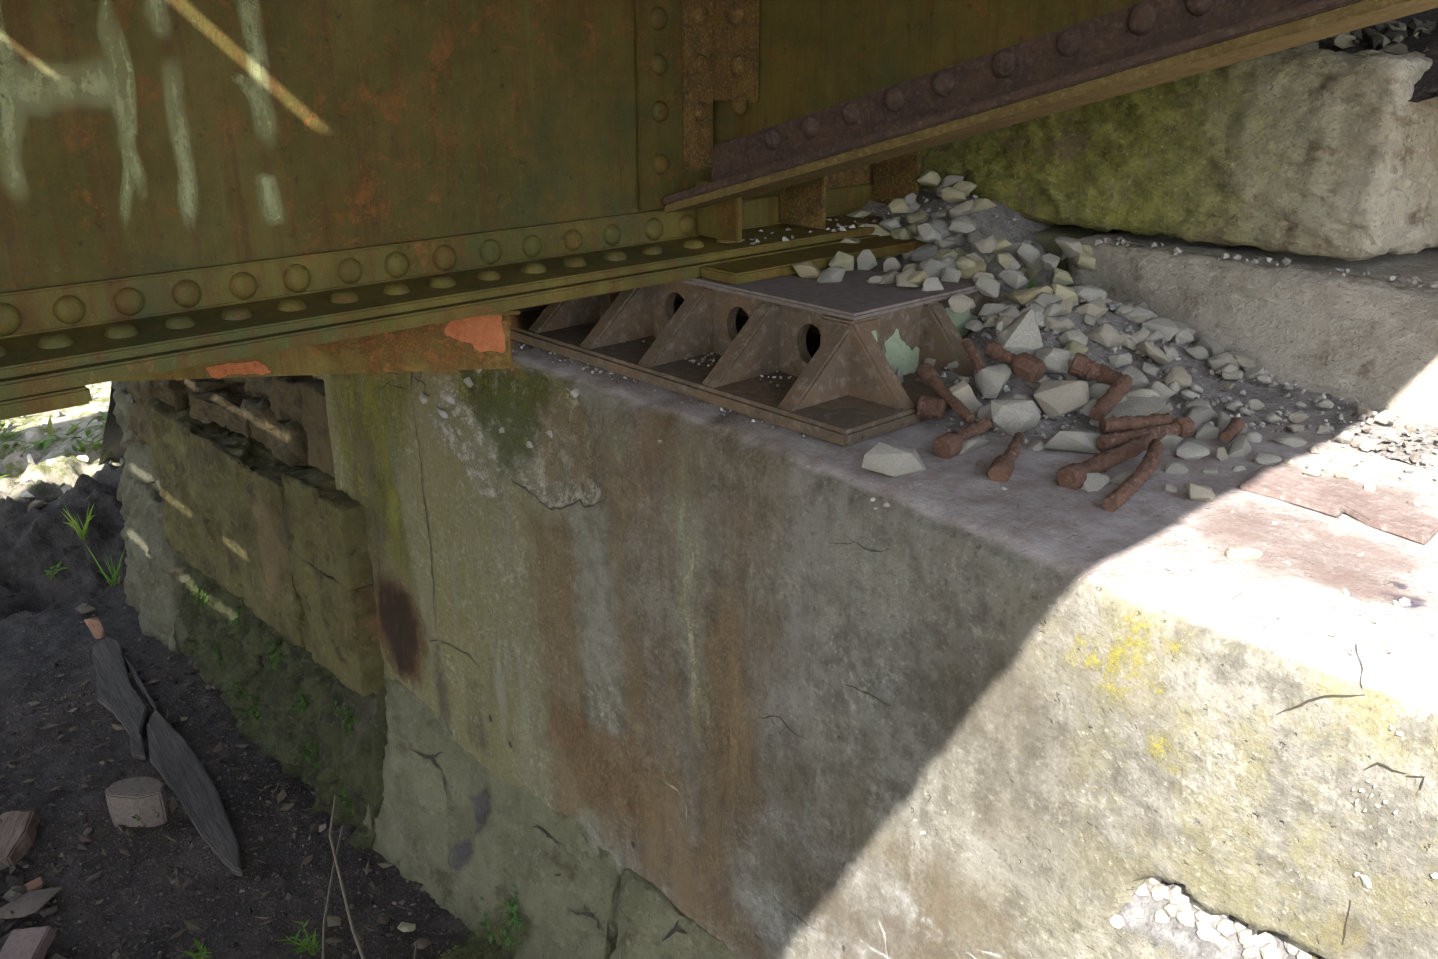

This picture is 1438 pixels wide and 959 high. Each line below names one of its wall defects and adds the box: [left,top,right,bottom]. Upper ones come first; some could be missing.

spalling [419,315,606,510]
crack [1276,644,1363,715]
spalling [1109,876,1357,959]